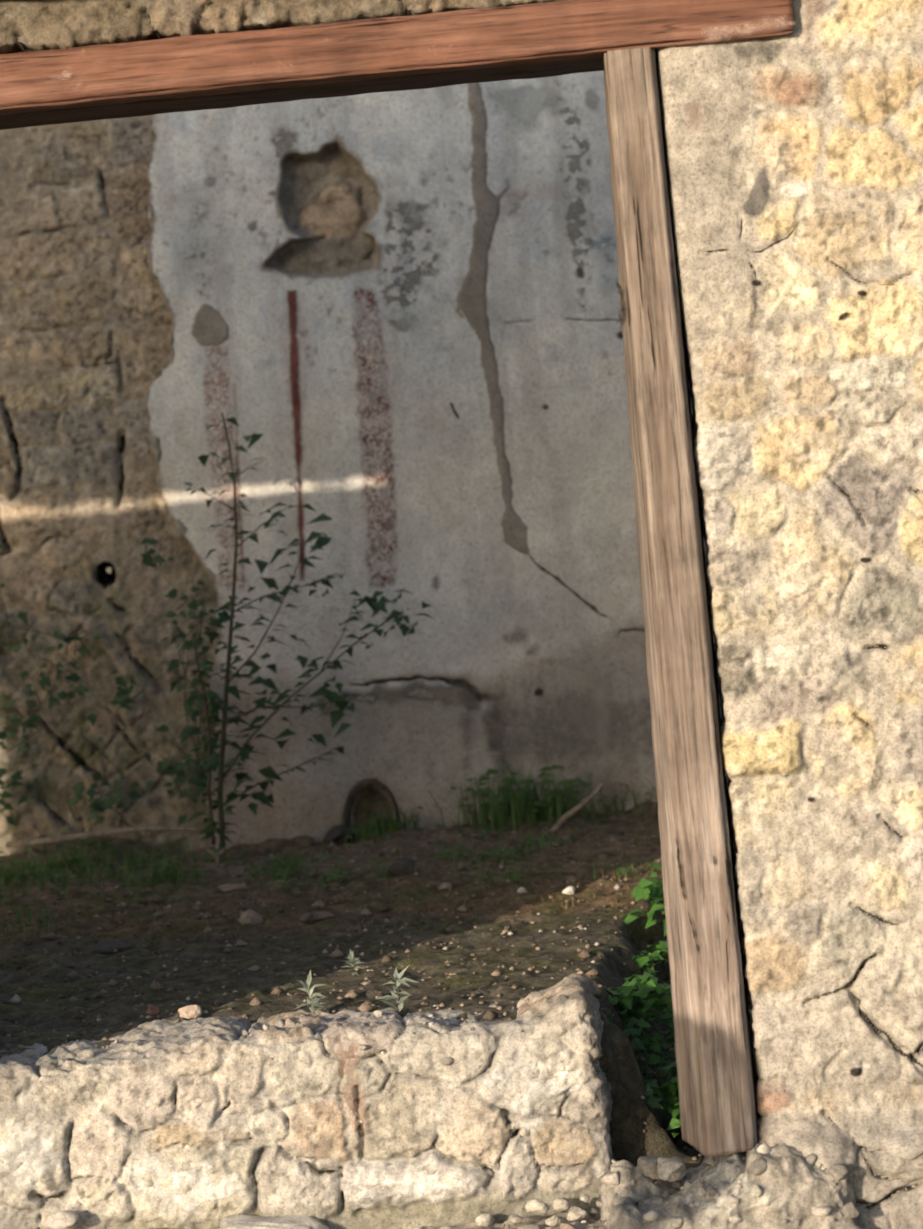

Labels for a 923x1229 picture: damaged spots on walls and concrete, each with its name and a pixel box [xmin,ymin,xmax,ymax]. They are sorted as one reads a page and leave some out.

spalling [268,129,438,307]
peeling [143,135,215,578]
spalling [191,274,229,347]
crack [456,83,645,633]
crack [353,675,480,700]
crack [856,907,897,925]
crack [810,956,923,1067]